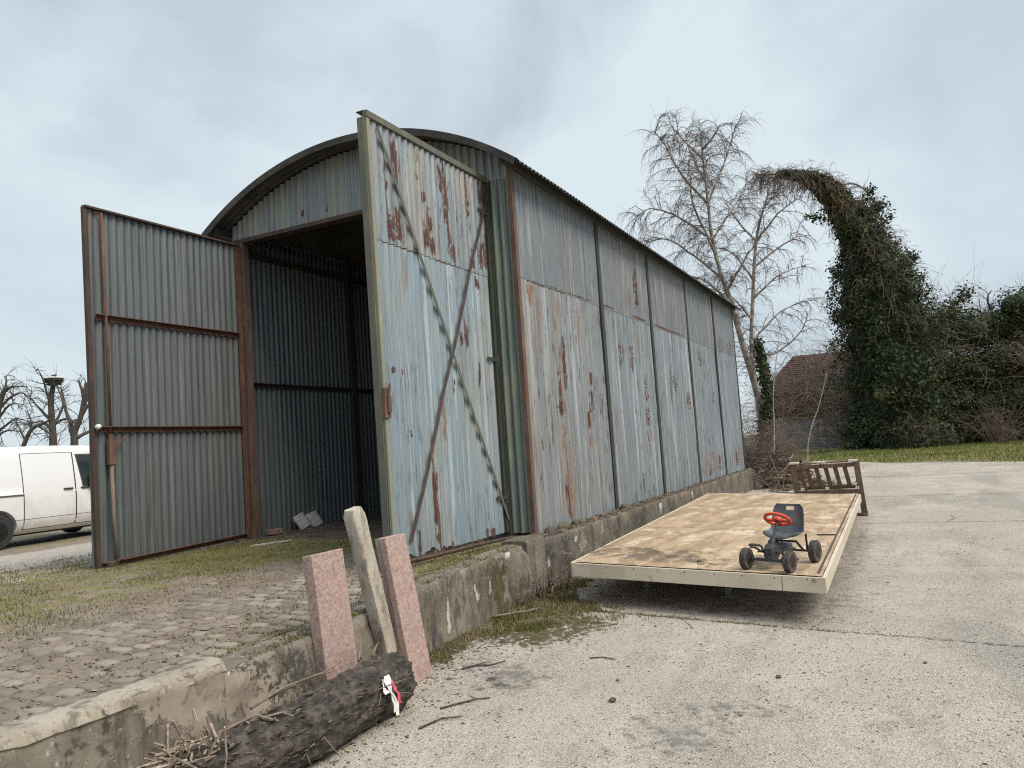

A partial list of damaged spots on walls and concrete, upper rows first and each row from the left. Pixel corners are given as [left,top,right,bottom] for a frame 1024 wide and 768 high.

corrosion [383,139,487,289]
corrosion [632,269,682,336]
corrosion [557,334,574,518]
corrosion [417,460,496,562]